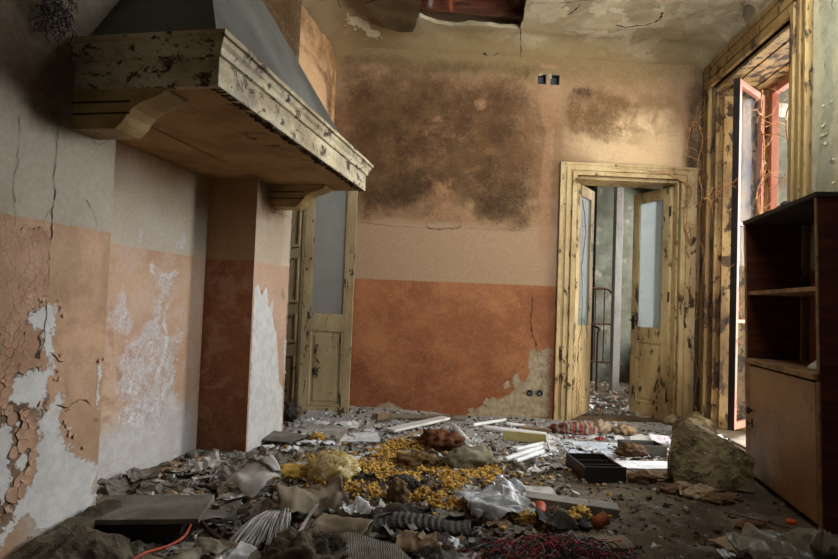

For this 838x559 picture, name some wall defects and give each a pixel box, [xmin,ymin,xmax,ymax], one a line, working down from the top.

peeling [344,13,385,40]
crack [589,2,663,39]
damp [300,45,545,232]
damp [564,85,638,144]
crack [13,118,63,362]
peeling [0,213,99,547]
peeling [93,357,105,422]
damp [97,261,192,486]
peeling [246,284,287,452]
flaking render [466,344,555,419]
crack [530,297,546,385]